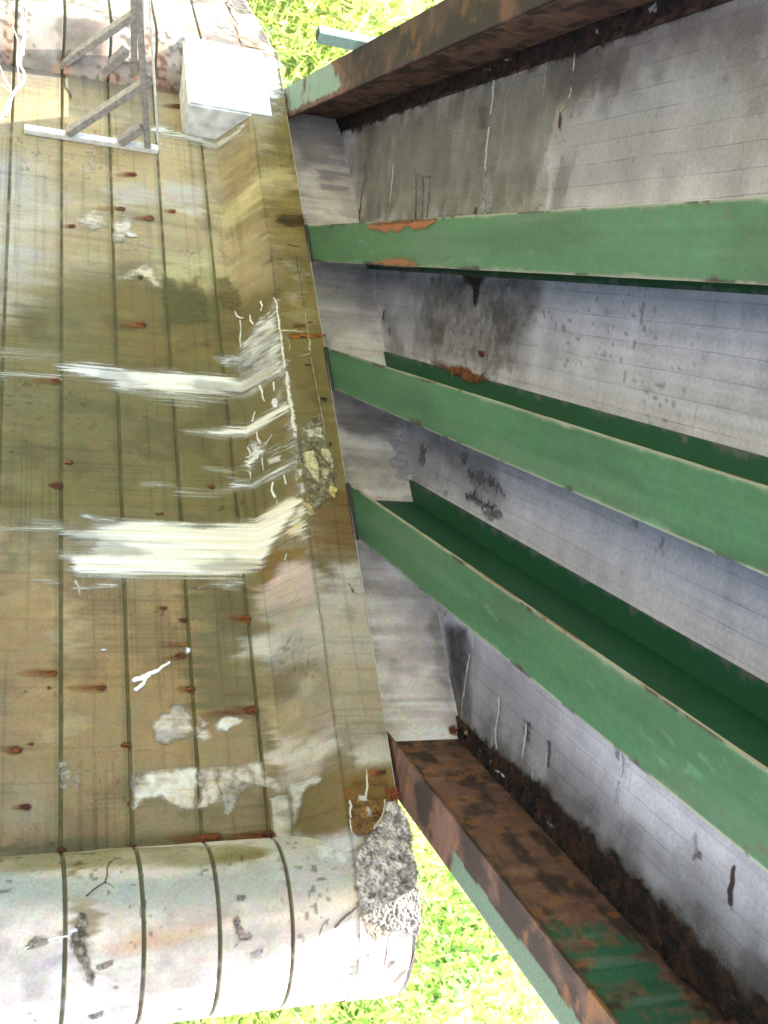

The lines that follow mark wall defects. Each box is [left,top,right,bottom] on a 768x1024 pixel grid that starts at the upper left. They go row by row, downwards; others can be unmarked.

rust [375,257,418,267]
leakage [424,278,539,375]
rust [431,361,486,383]
leakage [0,277,310,595]
spalling [294,414,338,516]
mould [461,454,505,519]
leakage [450,627,466,692]
peeling [153,704,243,744]
peeling [131,763,322,837]
rust [179,830,276,844]
crack [86,858,120,896]
spalling [349,799,421,941]